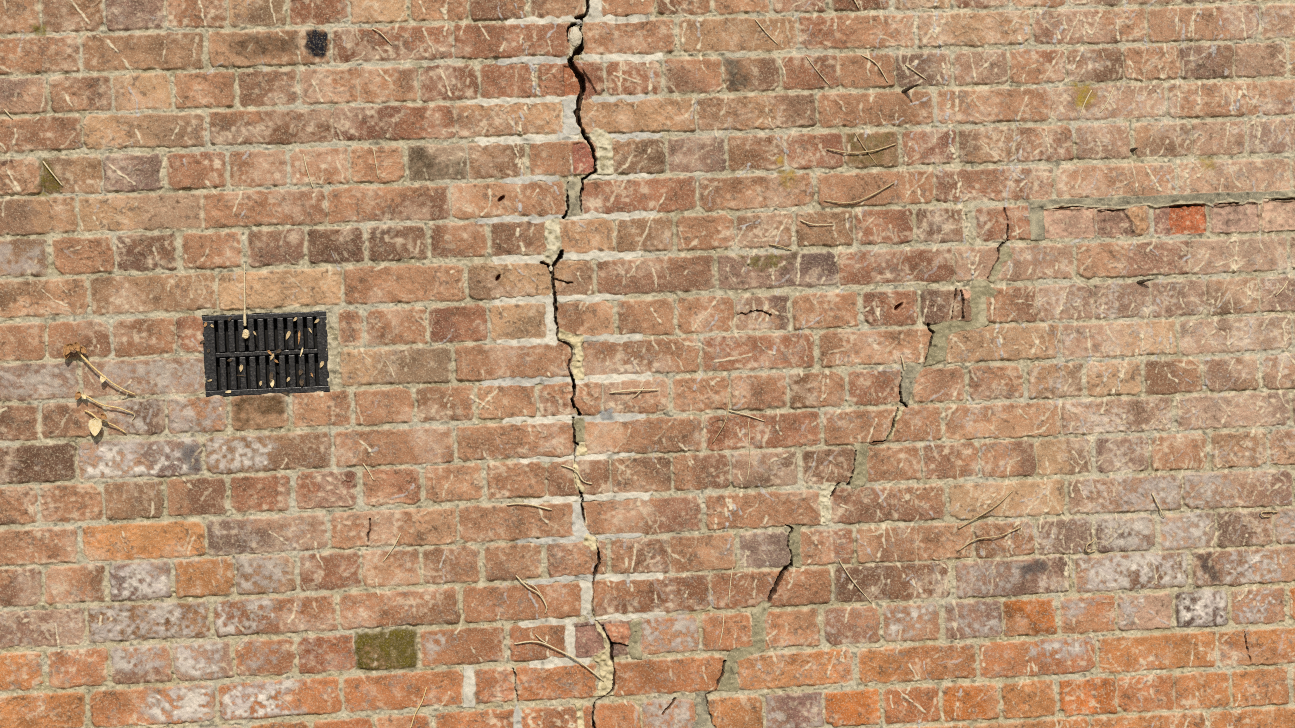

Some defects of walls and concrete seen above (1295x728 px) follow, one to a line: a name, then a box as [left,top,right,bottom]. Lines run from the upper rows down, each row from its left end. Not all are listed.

crack [1046,205,1126,213]
crack [1169,197,1295,208]
crack [737,309,772,317]
crack [539,0,629,728]
crack [830,207,1010,498]
crack [767,524,794,604]
crack [1243,631,1251,662]
crack [662,660,727,728]